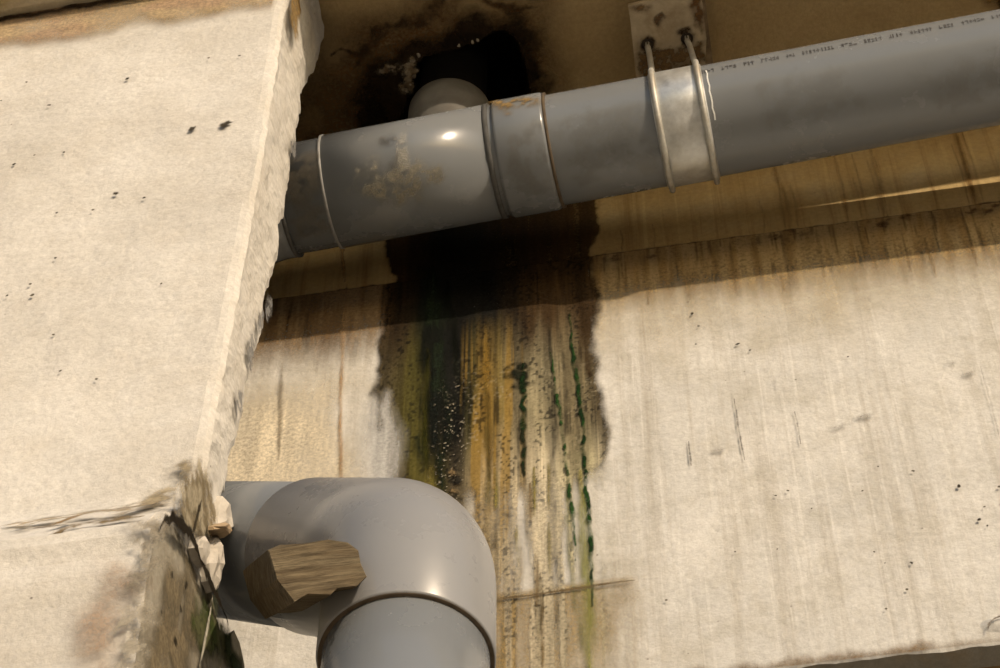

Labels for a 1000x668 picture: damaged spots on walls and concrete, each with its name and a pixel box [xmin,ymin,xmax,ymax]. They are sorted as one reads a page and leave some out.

water stain [291,0,551,158]
water stain [226,200,1000,668]
crack [7,460,228,623]
spalling [174,459,234,593]